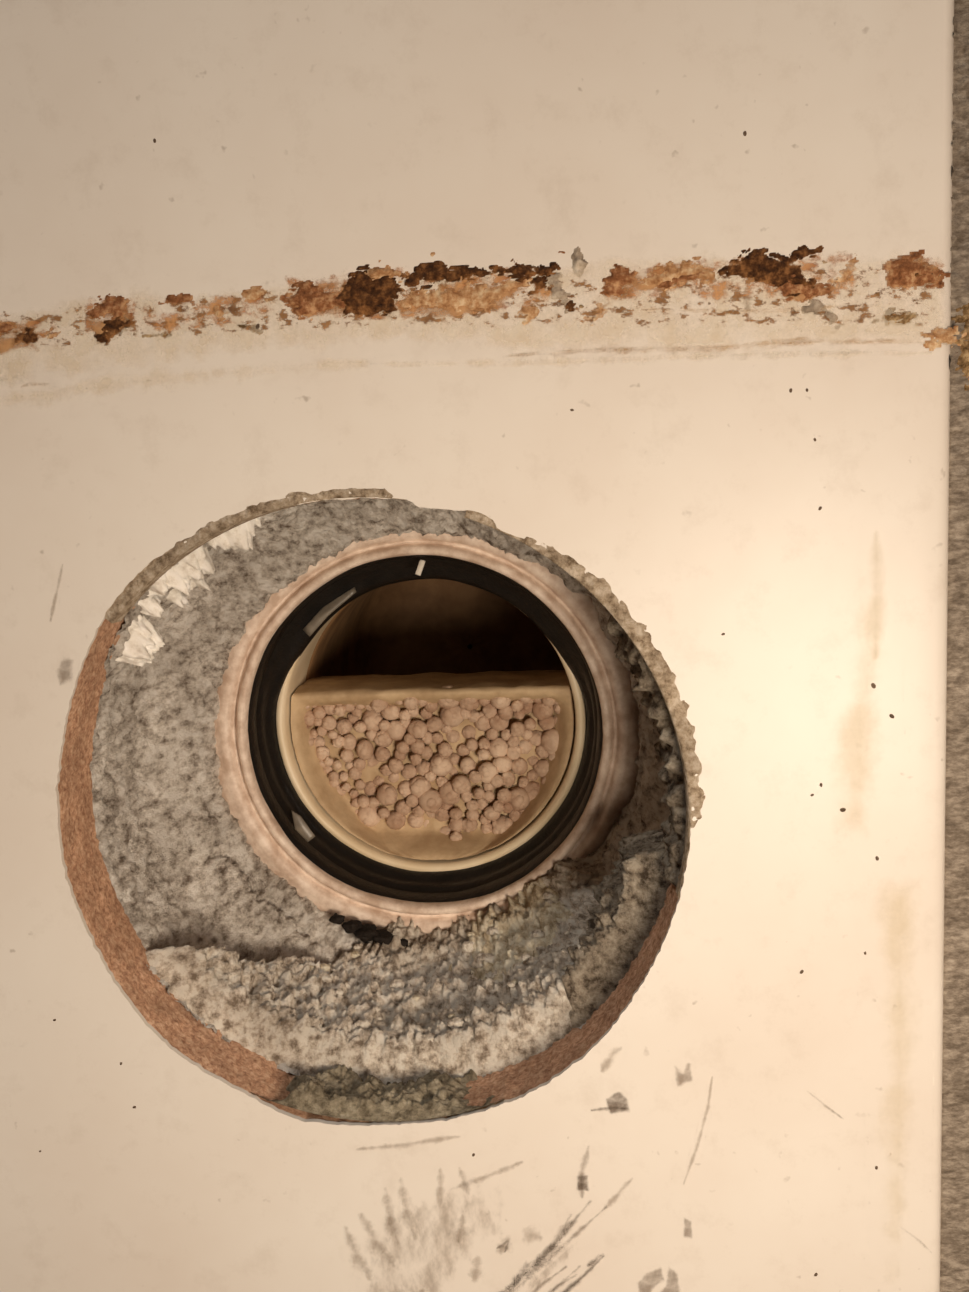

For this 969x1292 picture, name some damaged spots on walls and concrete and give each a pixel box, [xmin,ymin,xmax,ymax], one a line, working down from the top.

rust [0,245,969,391]